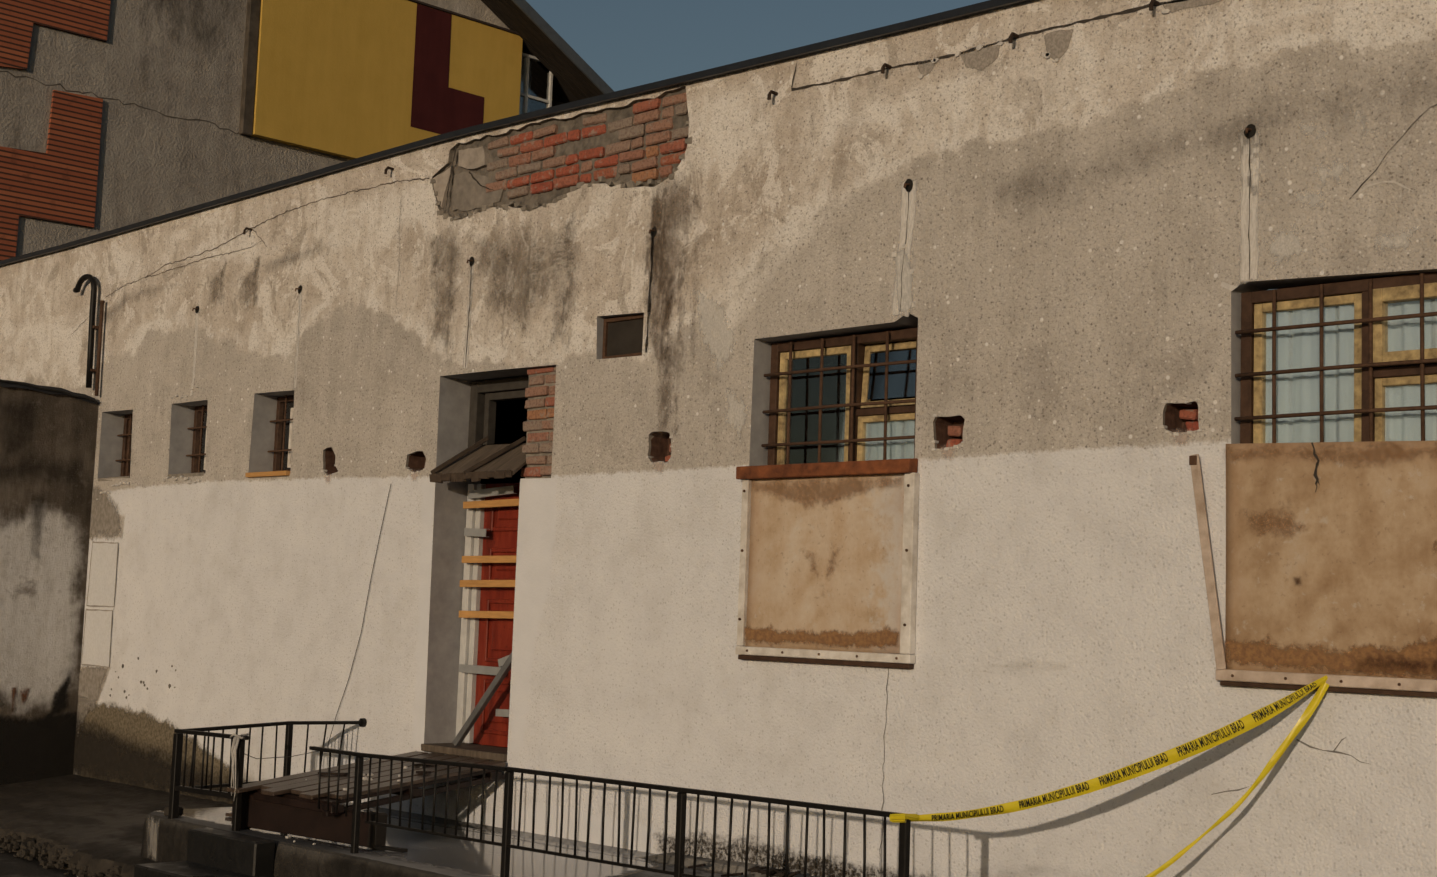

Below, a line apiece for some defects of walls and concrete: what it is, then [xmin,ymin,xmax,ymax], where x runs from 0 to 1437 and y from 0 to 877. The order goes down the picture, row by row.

crack [791,0,1186,91]
spalling [1043,29,1073,62]
crack [0,71,239,134]
spalling [430,88,692,221]
crack [72,178,429,334]
damp [651,191,689,353]
hole [321,448,339,481]
hole [646,432,673,470]
hole [931,414,965,457]
hole [1160,398,1202,442]
damp [89,487,120,540]
damp [0,666,245,804]